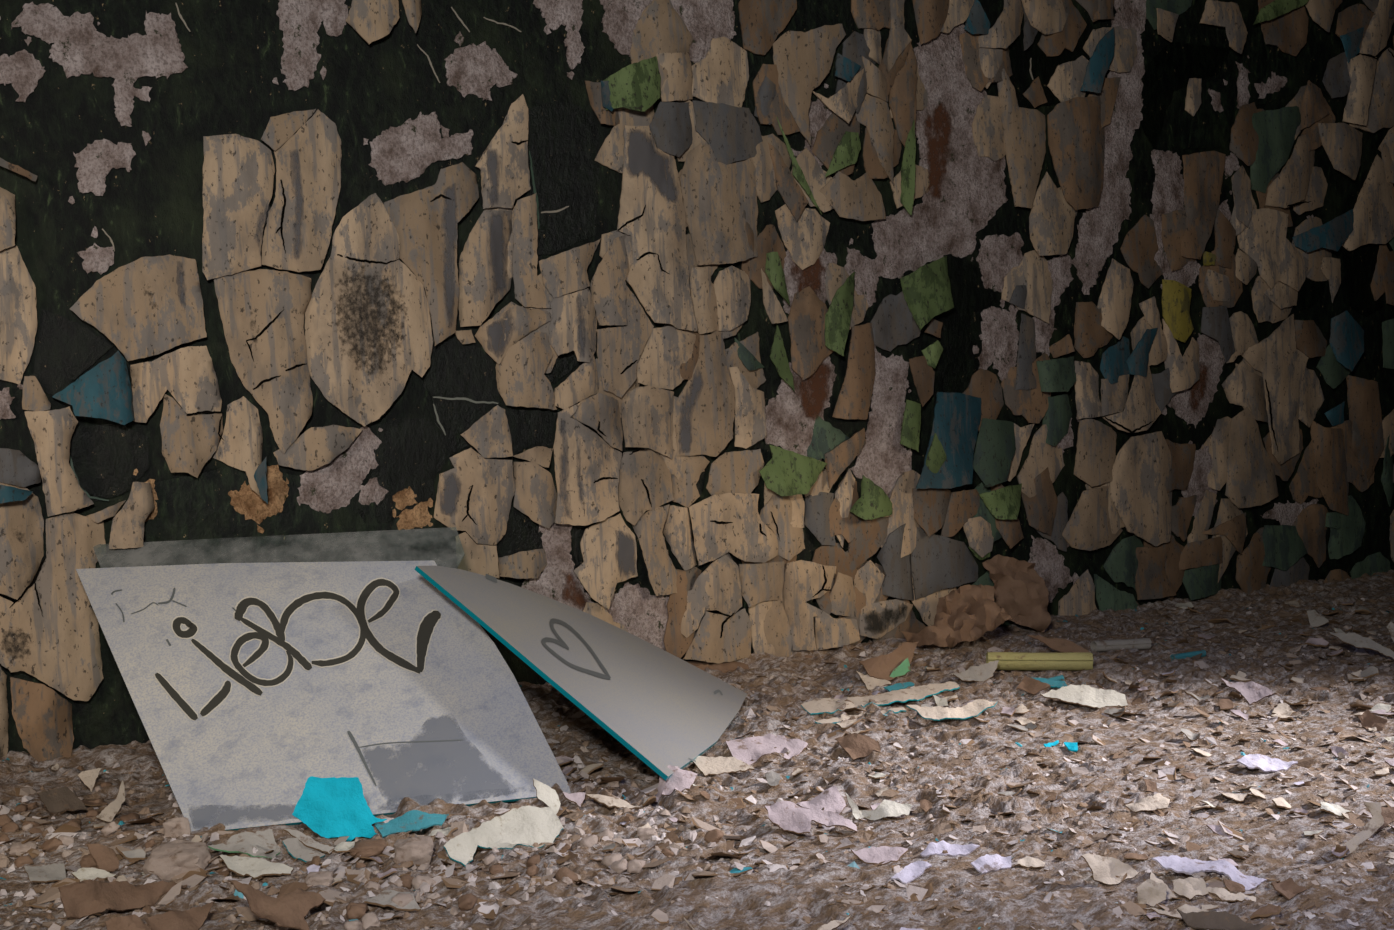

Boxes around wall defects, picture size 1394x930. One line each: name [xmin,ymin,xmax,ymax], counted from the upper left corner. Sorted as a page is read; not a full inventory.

crack [246,311,306,390]
leakage [336,267,406,374]
peeling [0,0,1394,721]
crack [10,558,45,616]
peeling [0,666,9,757]
peeling [10,677,74,762]
peeling [815,713,870,724]
peeling [77,768,102,793]